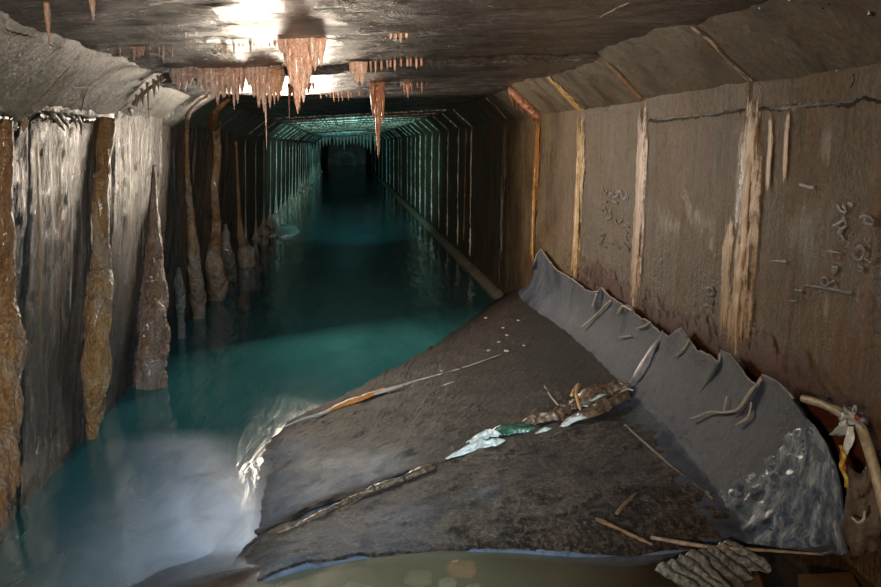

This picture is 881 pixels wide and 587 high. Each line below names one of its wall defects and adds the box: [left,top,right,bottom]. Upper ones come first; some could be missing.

water stain [35,129,73,356]
water stain [121,89,153,256]
crack [648,73,881,123]
rust [570,255,881,497]